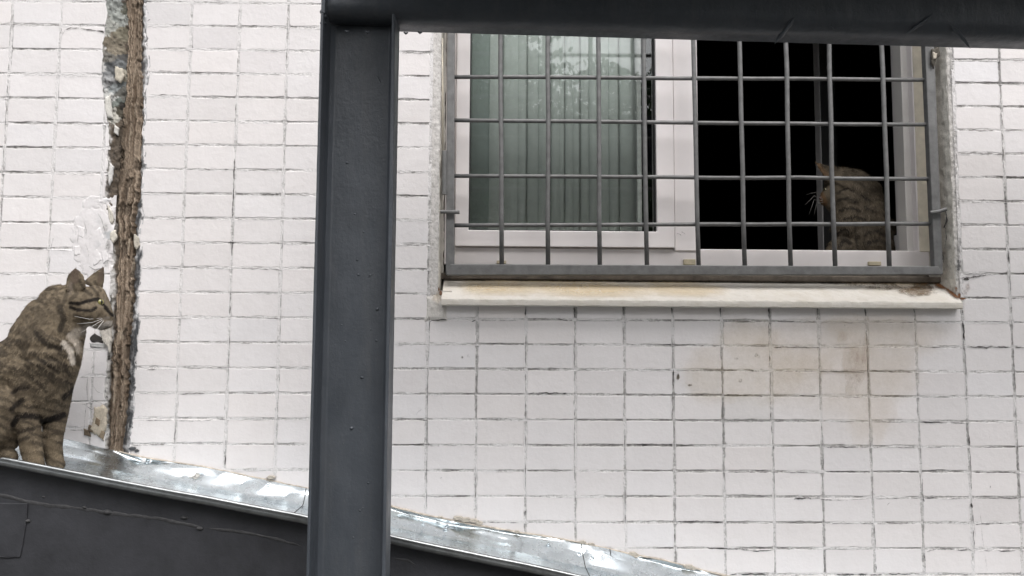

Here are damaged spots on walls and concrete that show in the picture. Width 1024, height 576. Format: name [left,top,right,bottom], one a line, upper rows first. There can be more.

peeling [70,0,150,454]